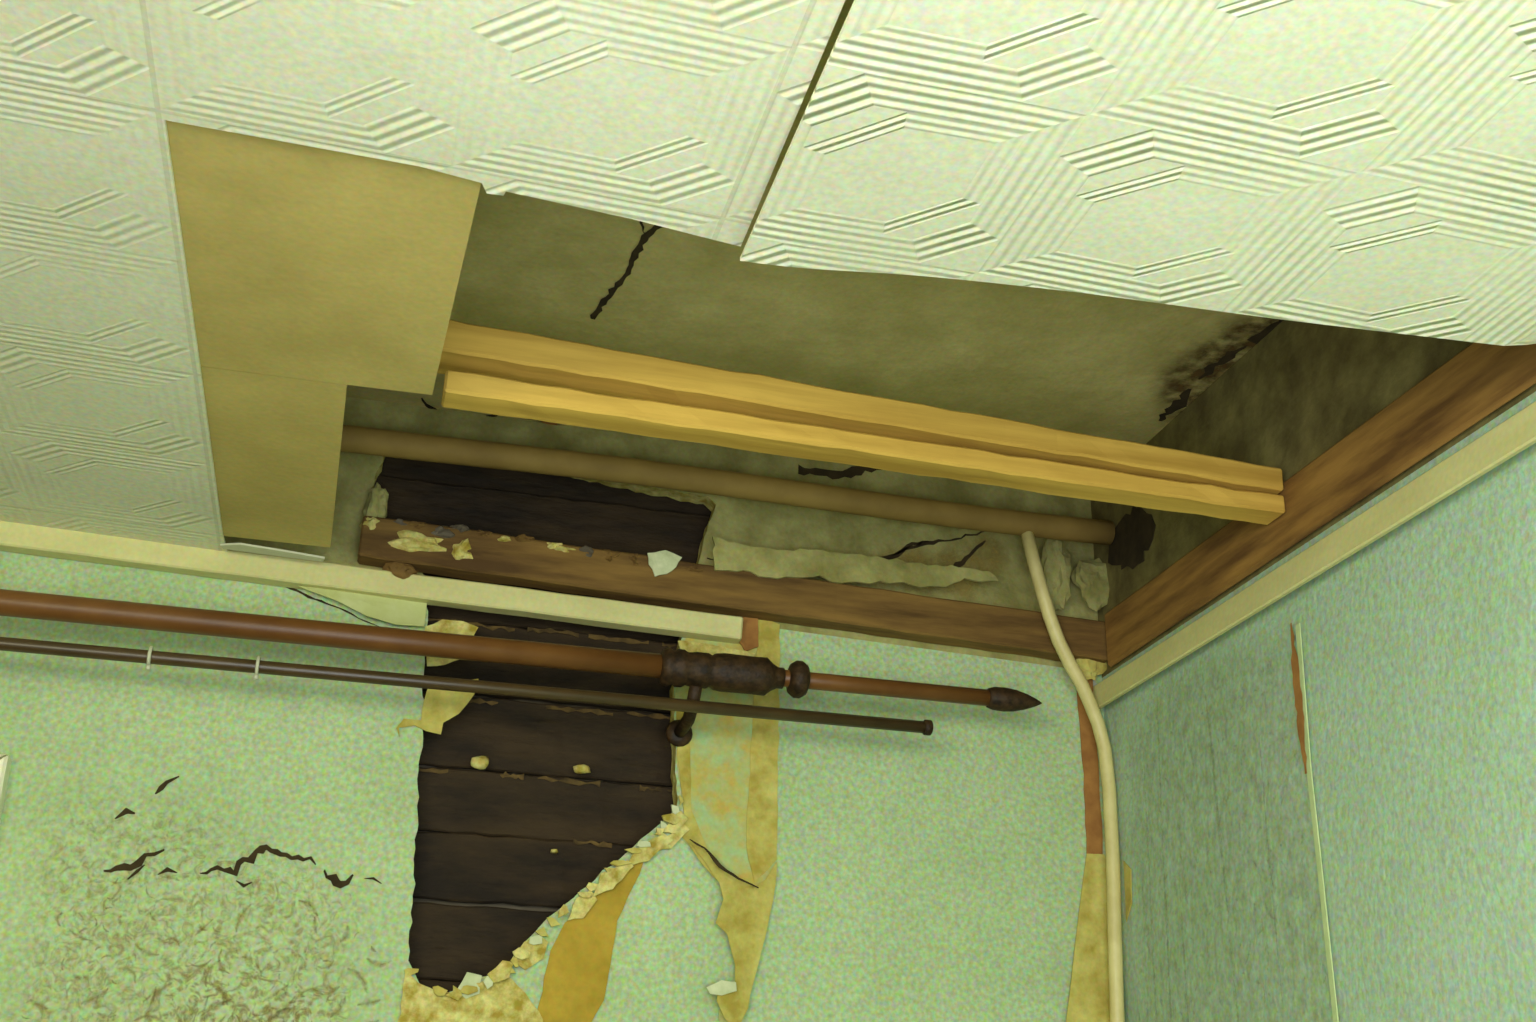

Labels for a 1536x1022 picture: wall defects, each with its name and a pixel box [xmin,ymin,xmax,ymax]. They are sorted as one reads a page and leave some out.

crack [590,221,662,320]
crack [1159,318,1283,421]
peeling [359,483,998,588]
peeling [1041,506,1156,612]
spalling [425,619,478,636]
spalling [678,617,759,656]
spalling [396,679,478,737]
crack [115,776,179,819]
spalling [470,756,489,770]
spalling [573,764,591,774]
crack [103,844,382,888]
spalling [397,795,690,1022]